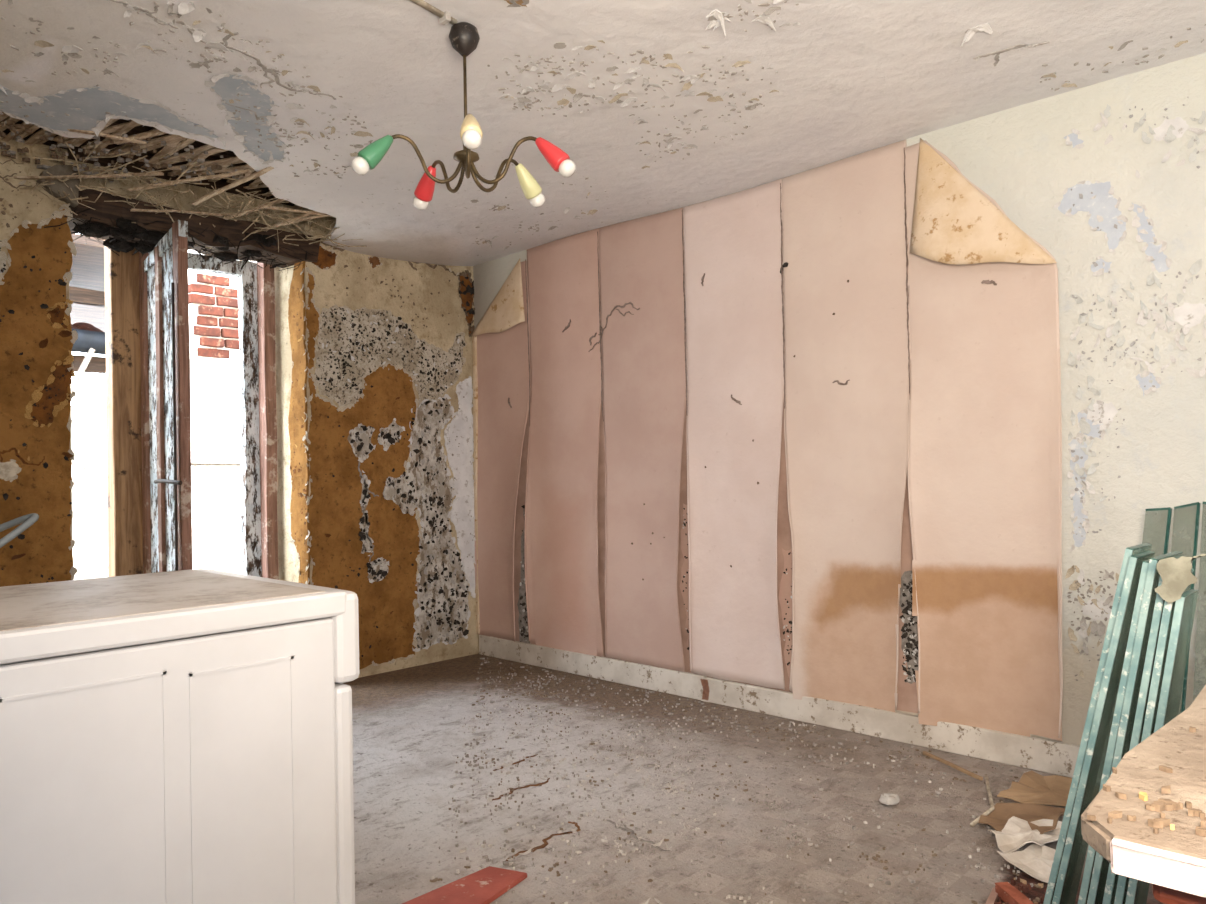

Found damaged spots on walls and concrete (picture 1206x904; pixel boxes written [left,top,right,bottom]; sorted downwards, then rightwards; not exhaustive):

peeling [0,0,373,178]
crack [107,0,336,120]
peeling [487,40,779,169]
peeling [706,0,800,37]
peeling [1064,97,1206,169]
peeling [1074,24,1206,73]
peeling [471,178,606,256]
flaking render [0,203,78,587]
flaking render [285,244,476,670]
peeling [1054,180,1206,681]
leakage [779,549,1062,741]